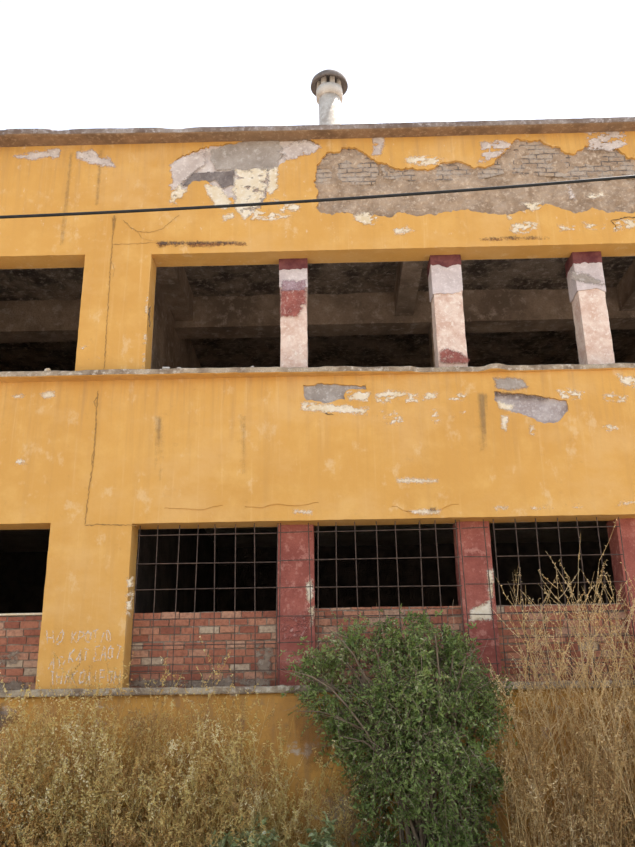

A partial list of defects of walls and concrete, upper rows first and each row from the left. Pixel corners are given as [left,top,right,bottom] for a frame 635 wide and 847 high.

peeling [13,148,60,160]
peeling [76,149,116,167]
flaking render [170,131,635,239]
crack [103,215,179,370]
flaking render [302,383,436,414]
flaking render [494,378,581,435]
crack [85,391,137,526]